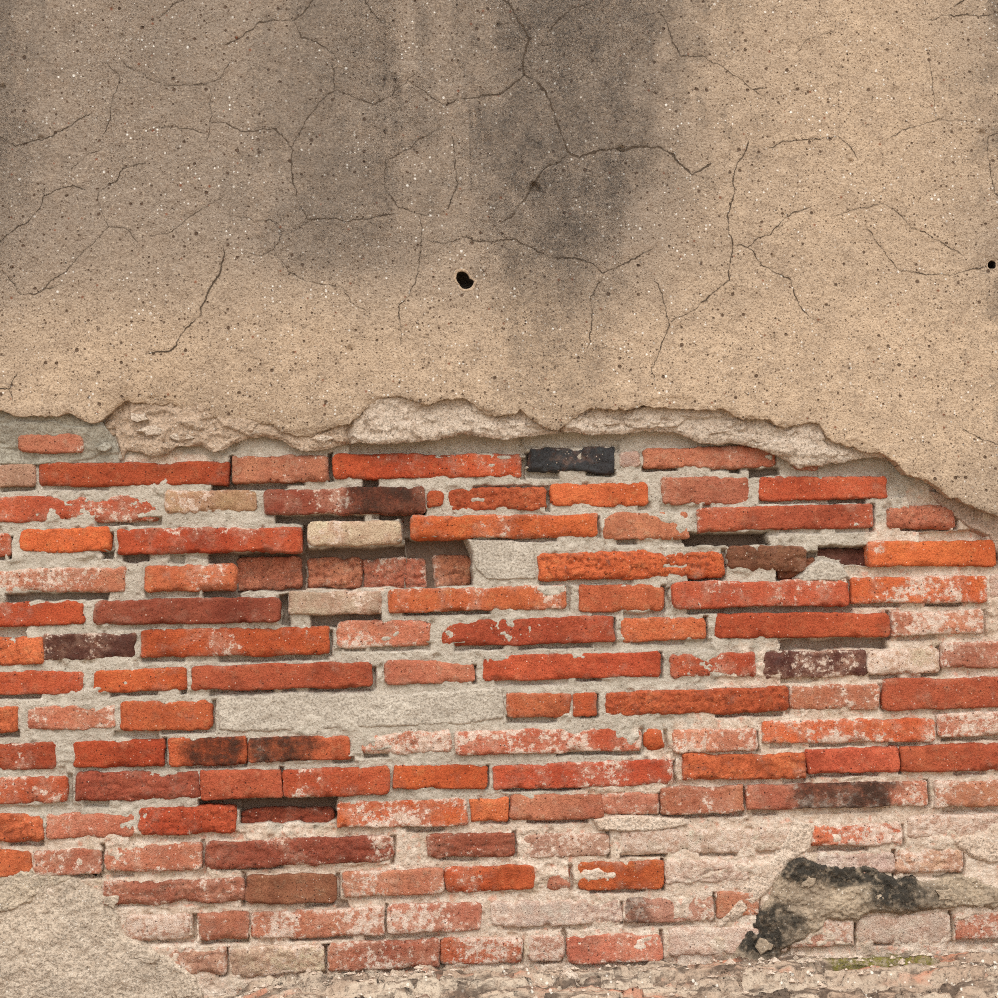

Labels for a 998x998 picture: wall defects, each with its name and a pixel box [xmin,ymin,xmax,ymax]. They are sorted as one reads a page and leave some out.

crack [925,0,998,21]
crack [658,9,760,95]
crack [0,0,711,354]
crack [651,136,858,381]
crack [836,203,982,276]
flaking render [0,397,888,469]
flaking render [929,491,998,560]
flaking render [0,867,204,998]
leakage [739,904,804,957]
leakage [783,857,926,909]
flaking render [731,860,998,961]
flaking render [953,835,998,864]